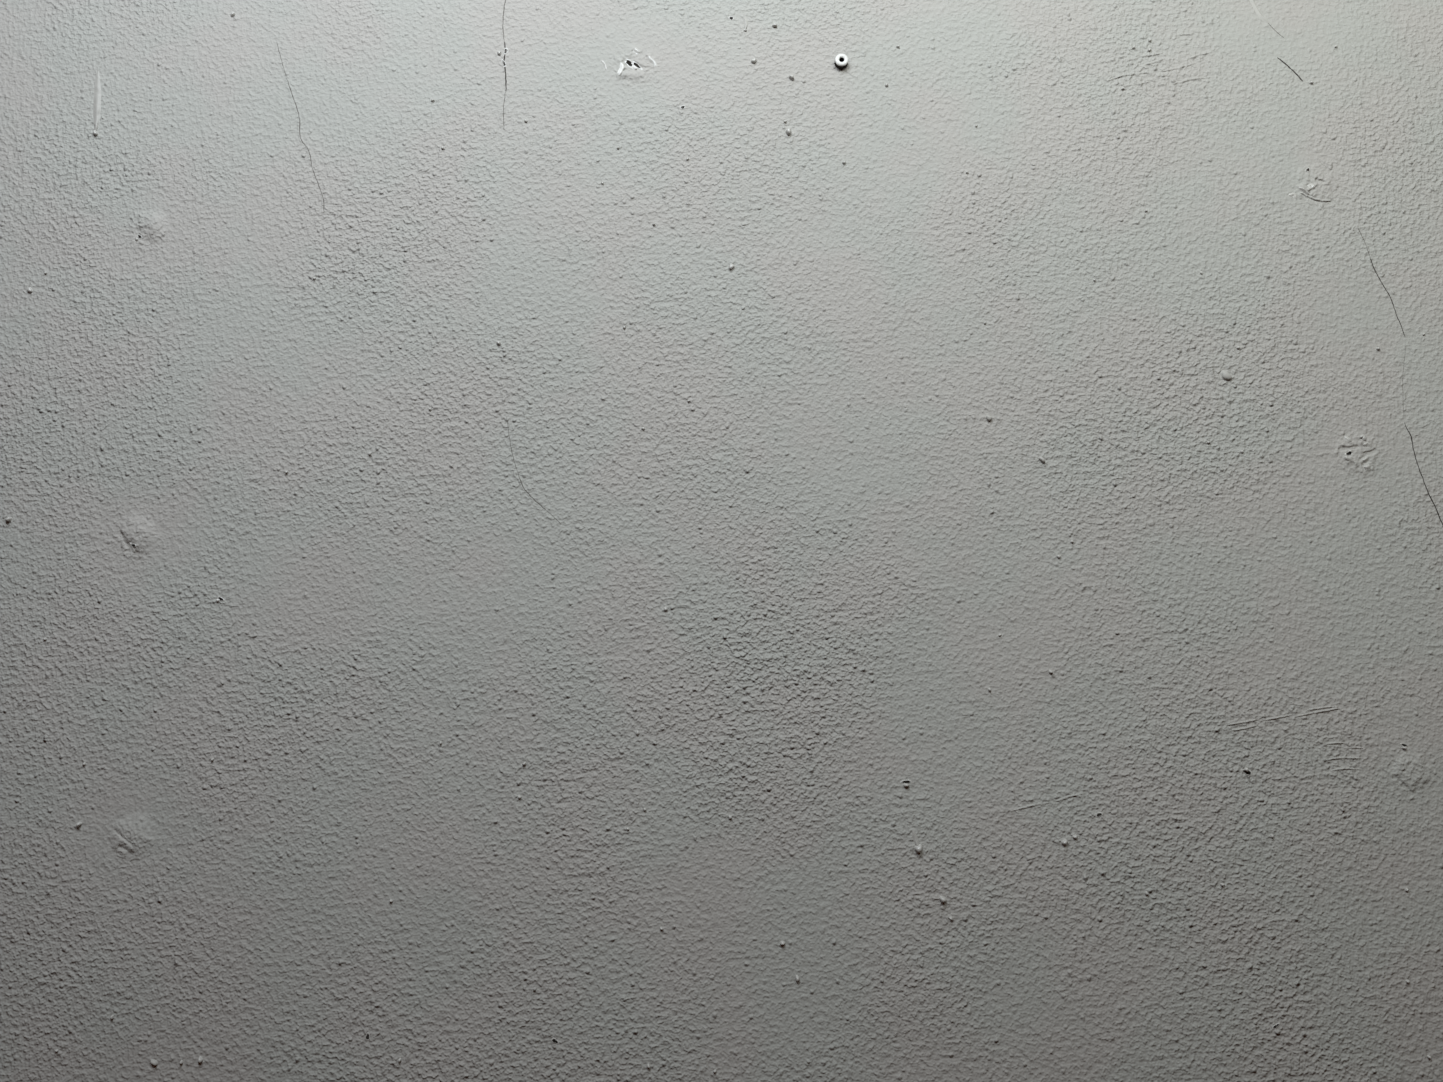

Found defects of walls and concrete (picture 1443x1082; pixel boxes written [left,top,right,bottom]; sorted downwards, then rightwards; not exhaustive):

crack [501,0,509,130]
crack [1357,227,1443,531]